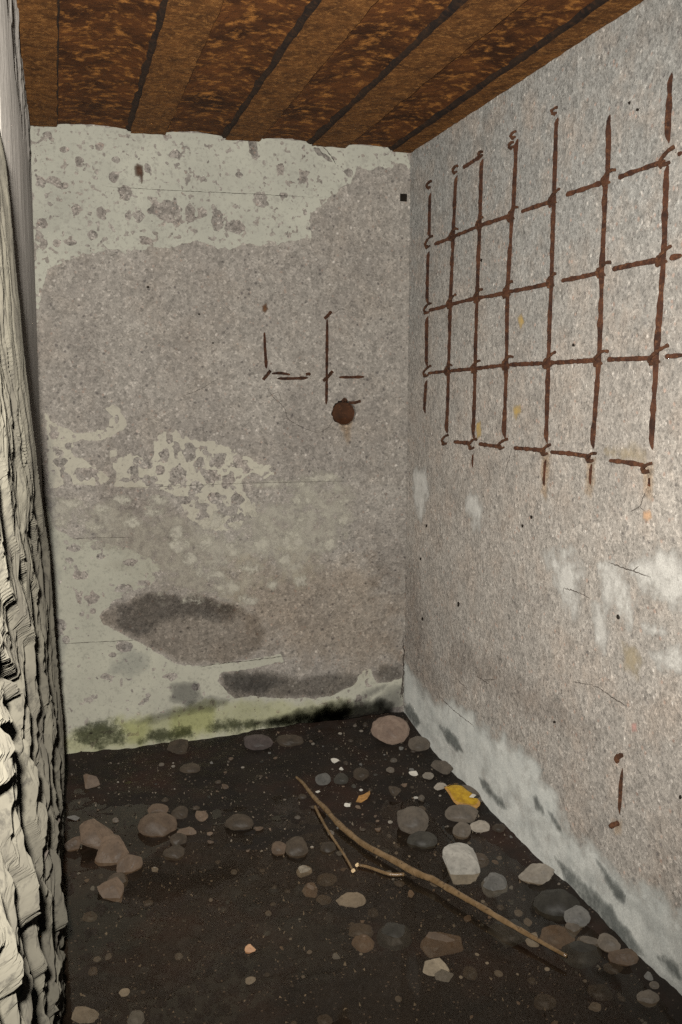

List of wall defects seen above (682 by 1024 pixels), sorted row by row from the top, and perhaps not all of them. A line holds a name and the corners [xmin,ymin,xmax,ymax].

peeling [30,124,410,330]
rust [262,332,311,381]
rust [323,311,365,404]
peeling [43,405,404,754]
water stain [78,723,123,749]
water stain [149,729,191,741]
water stain [214,700,392,729]
water stain [404,663,682,995]